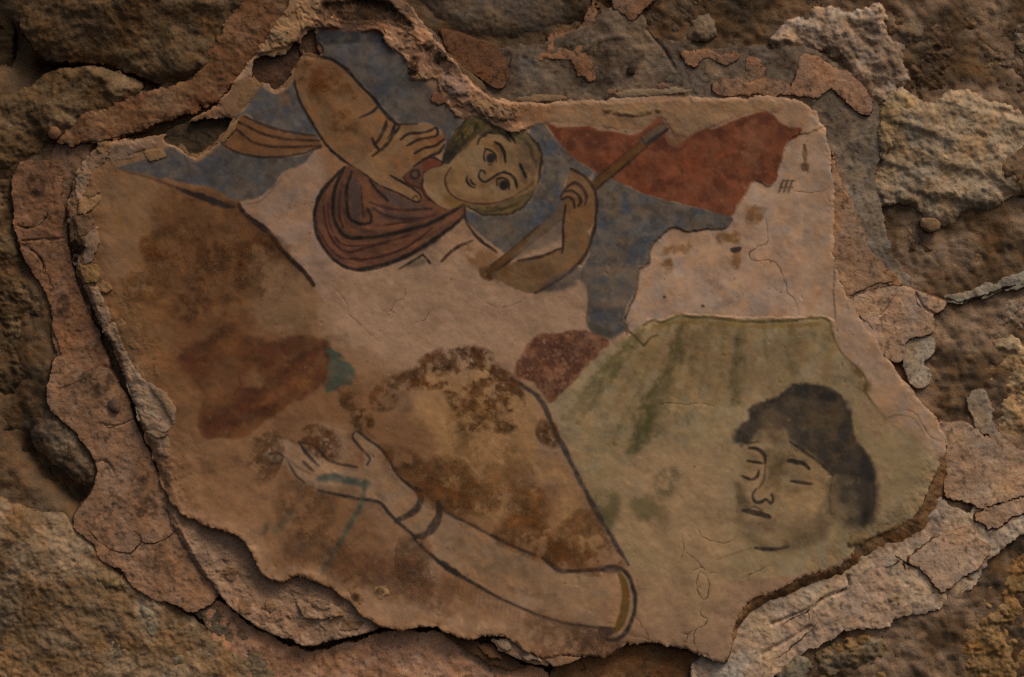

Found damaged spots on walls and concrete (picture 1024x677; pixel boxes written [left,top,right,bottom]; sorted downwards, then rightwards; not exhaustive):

flaking render [320,0,414,30]
flaking render [408,41,486,92]
flaking render [607,82,692,98]
water stain [371,347,523,431]
spalling [725,440,948,661]